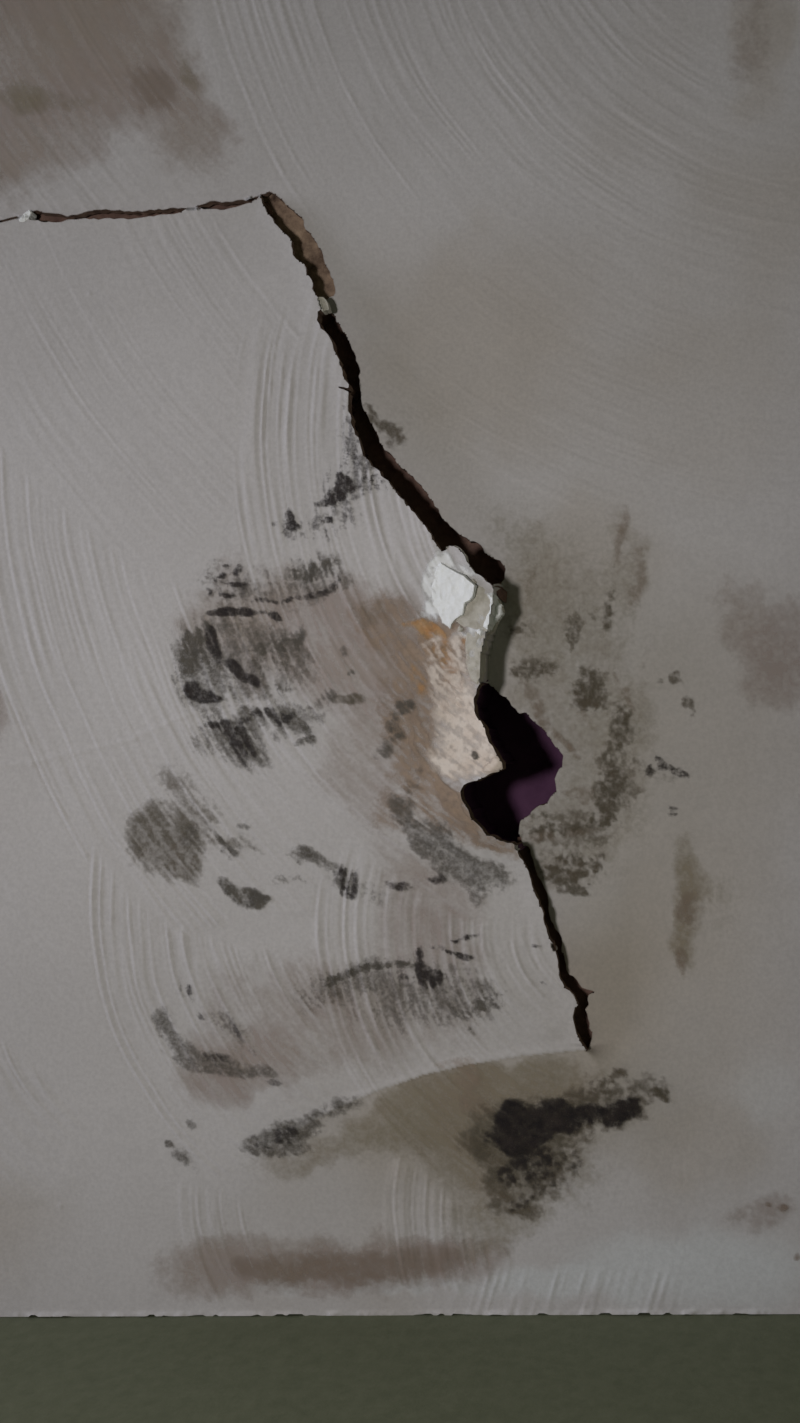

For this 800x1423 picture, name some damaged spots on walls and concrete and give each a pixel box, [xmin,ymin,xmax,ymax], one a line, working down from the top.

spalling [318,297,332,315]
crack [0,191,507,603]
leakage [173,559,426,766]
peeling [421,545,560,845]
mould [128,802,238,880]
mould [219,879,270,909]
leakage [318,930,497,1029]
mould [390,792,507,897]
crack [517,837,594,1051]
leakage [545,854,604,896]
mould [245,1100,352,1156]
leakage [364,1062,668,1222]